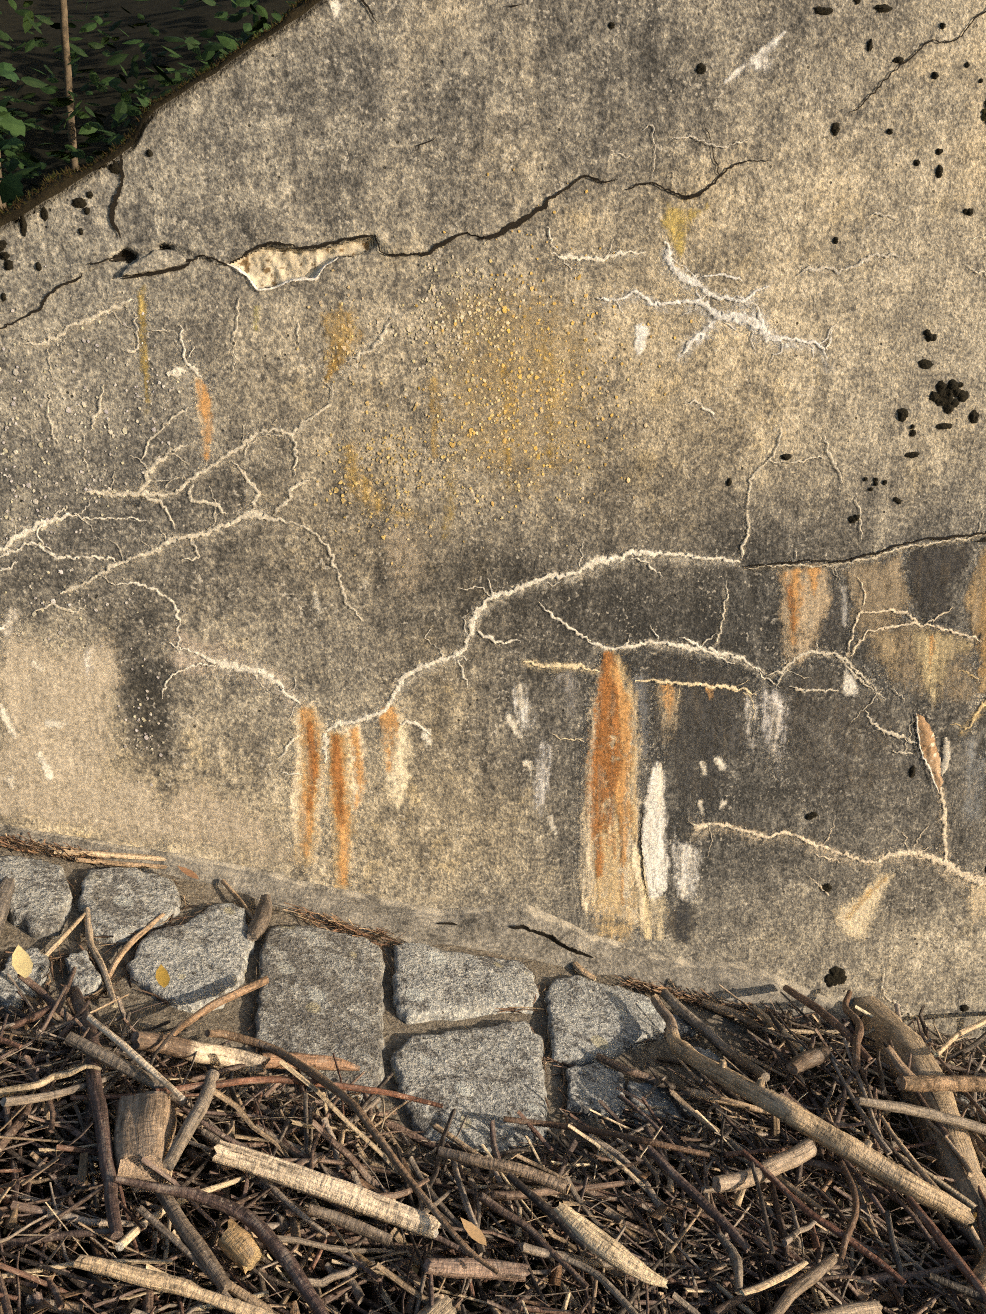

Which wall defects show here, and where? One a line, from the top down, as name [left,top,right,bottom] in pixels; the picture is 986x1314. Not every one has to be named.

spalling [227,238,373,291]
crack [0,122,986,775]
rust [780,567,832,664]
rust [845,549,986,707]
water stain [506,684,535,738]
rust [289,703,413,890]
water stain [523,744,557,835]
rust [578,651,645,941]
crack [639,808,649,899]
water stain [633,656,899,944]
crack [690,787,986,896]
crack [510,924,593,958]